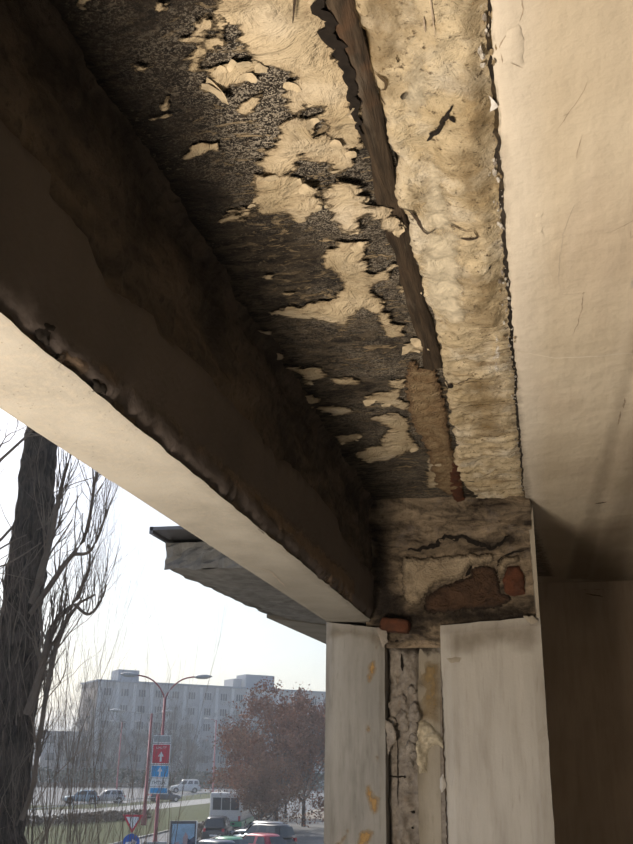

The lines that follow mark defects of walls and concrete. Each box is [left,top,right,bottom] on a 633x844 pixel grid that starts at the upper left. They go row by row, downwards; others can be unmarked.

flaking render [155,2,170,12]
spalling [477,44,497,68]
flaking render [149,96,172,121]
spalling [488,158,505,232]
flaking render [177,0,465,502]
crack [485,0,633,495]
spalling [35,323,56,345]
spalling [91,379,107,395]
crack [408,534,522,573]
crack [391,738,405,798]